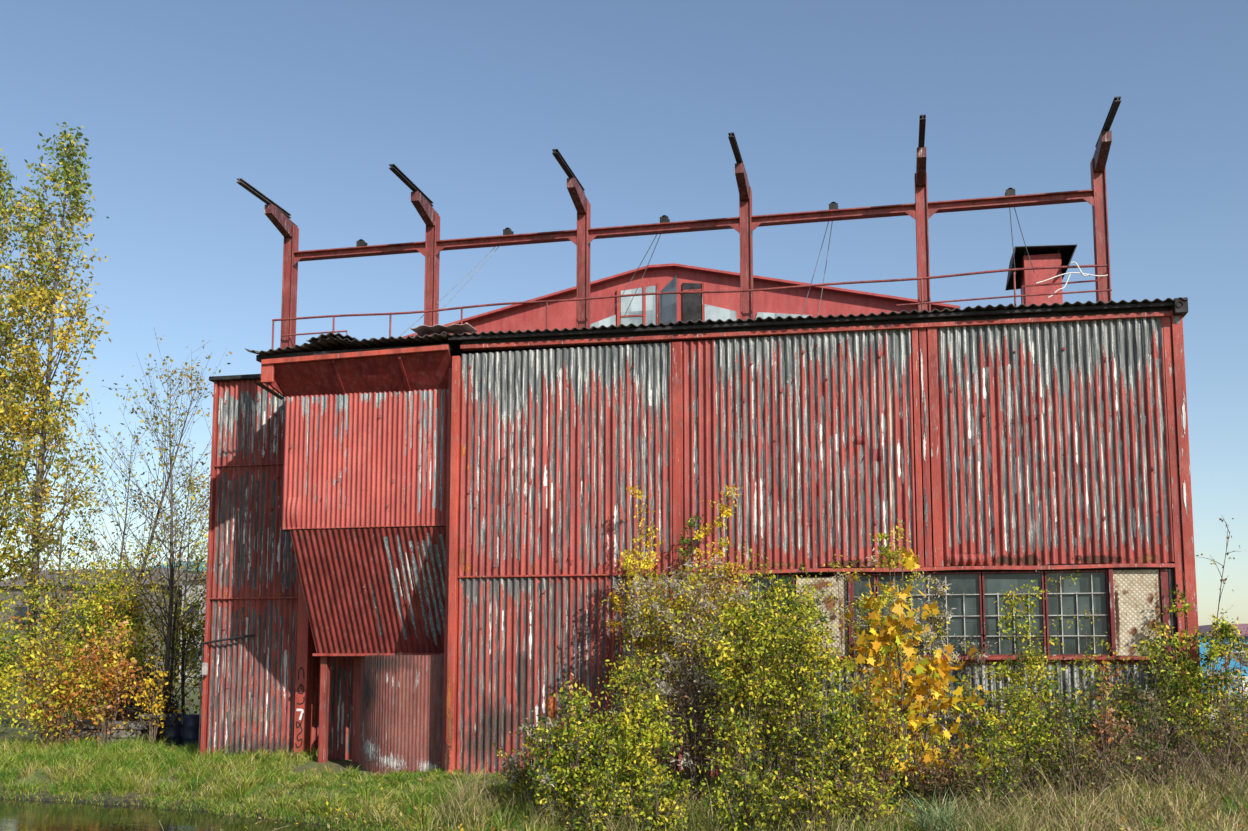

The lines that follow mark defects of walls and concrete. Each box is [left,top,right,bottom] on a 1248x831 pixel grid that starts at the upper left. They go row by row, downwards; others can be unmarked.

peeling [208,389,448,764]
peeling [459,342,725,774]
peeling [714,316,1180,562]